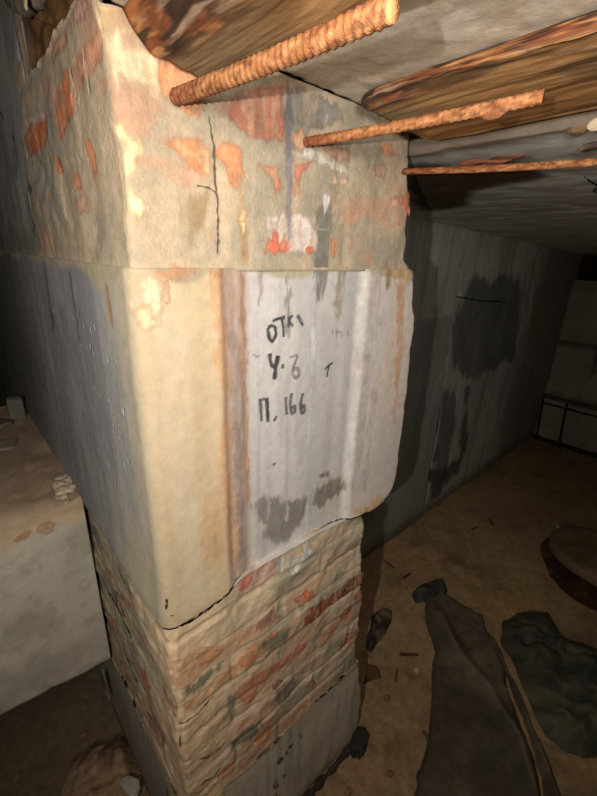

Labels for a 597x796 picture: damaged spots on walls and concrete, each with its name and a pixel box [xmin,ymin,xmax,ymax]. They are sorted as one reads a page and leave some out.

spalling [19,0,545,165]
flaking render [115,125,144,176]
flaking render [129,192,144,215]
peeling [167,137,246,233]
crack [197,122,219,254]
damp [284,88,349,239]
spalling [402,158,597,175]
damp [258,271,390,542]
crack [317,513,368,531]
damp [277,542,316,576]
crack [162,571,246,630]